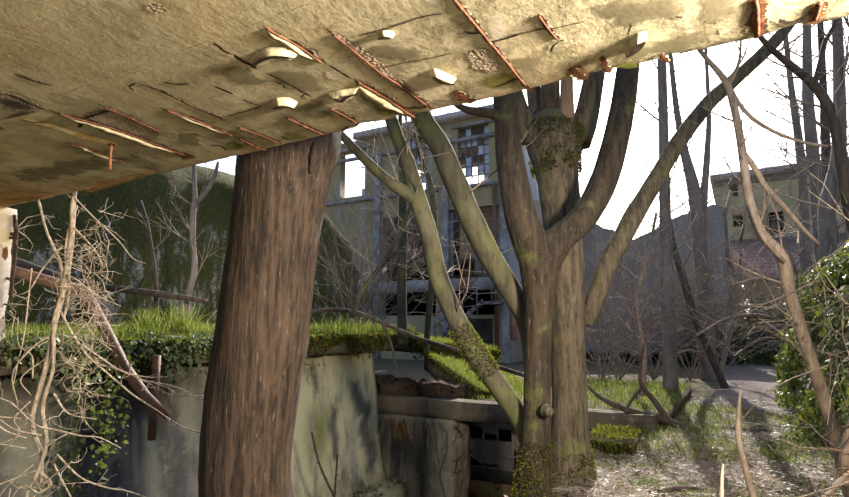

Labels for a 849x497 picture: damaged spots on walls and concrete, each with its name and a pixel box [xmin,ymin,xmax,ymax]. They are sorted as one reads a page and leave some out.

crack [506,21,585,38]
crack [213,43,311,98]
crack [381,53,452,68]
crack [214,86,260,116]
damp [352,383,376,472]